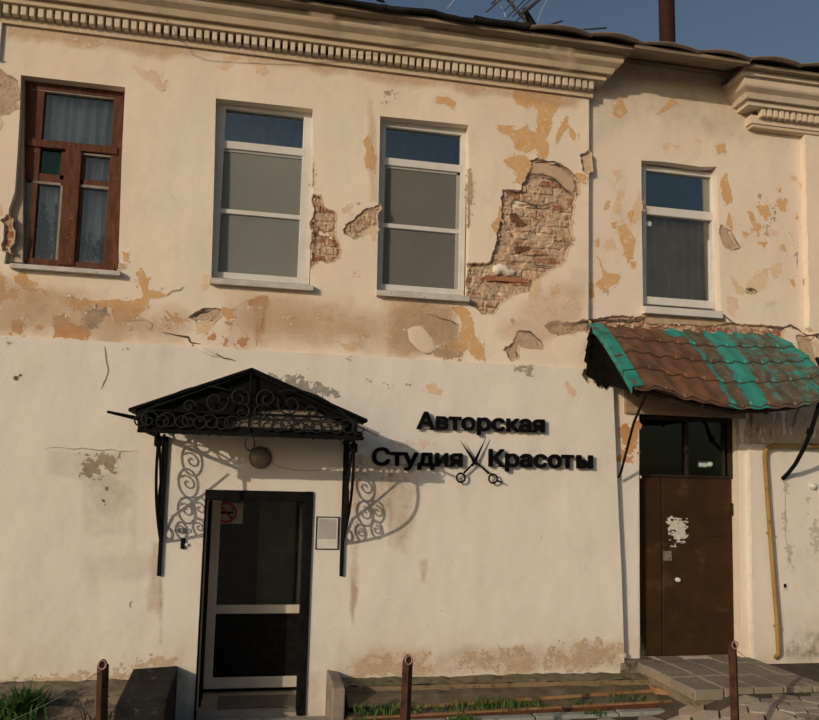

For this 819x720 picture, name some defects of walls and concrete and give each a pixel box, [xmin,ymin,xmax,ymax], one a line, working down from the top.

spalling [0,69,20,130]
spalling [309,157,382,270]
spalling [412,89,593,362]
spalling [544,170,805,339]
peeling [0,252,169,346]
crack [128,308,235,361]
spalling [160,291,273,349]
spalling [503,317,544,377]
peeling [257,368,341,398]
peeling [616,421,642,464]
spalling [735,404,819,445]
peeling [79,451,124,505]